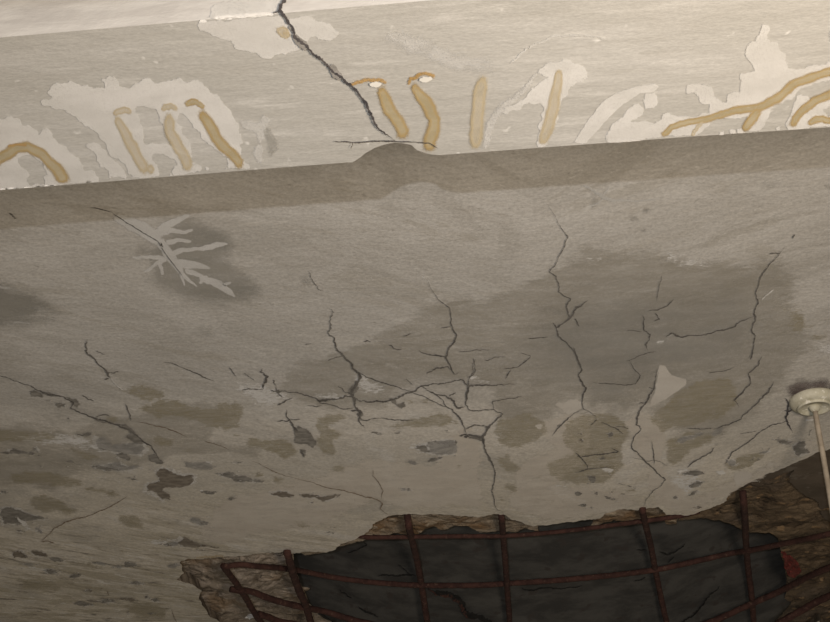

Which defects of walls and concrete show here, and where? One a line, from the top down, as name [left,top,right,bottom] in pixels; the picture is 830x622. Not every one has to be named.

leakage [0,76,280,190]
leakage [197,0,339,59]
crack [273,0,437,148]
leakage [483,59,588,149]
leakage [574,24,830,144]
leakage [113,214,274,309]
peeling [0,495,84,534]
crack [0,342,184,464]
peeling [0,429,341,504]
spalling [159,413,830,622]
crack [229,210,811,517]
peeling [647,377,737,500]